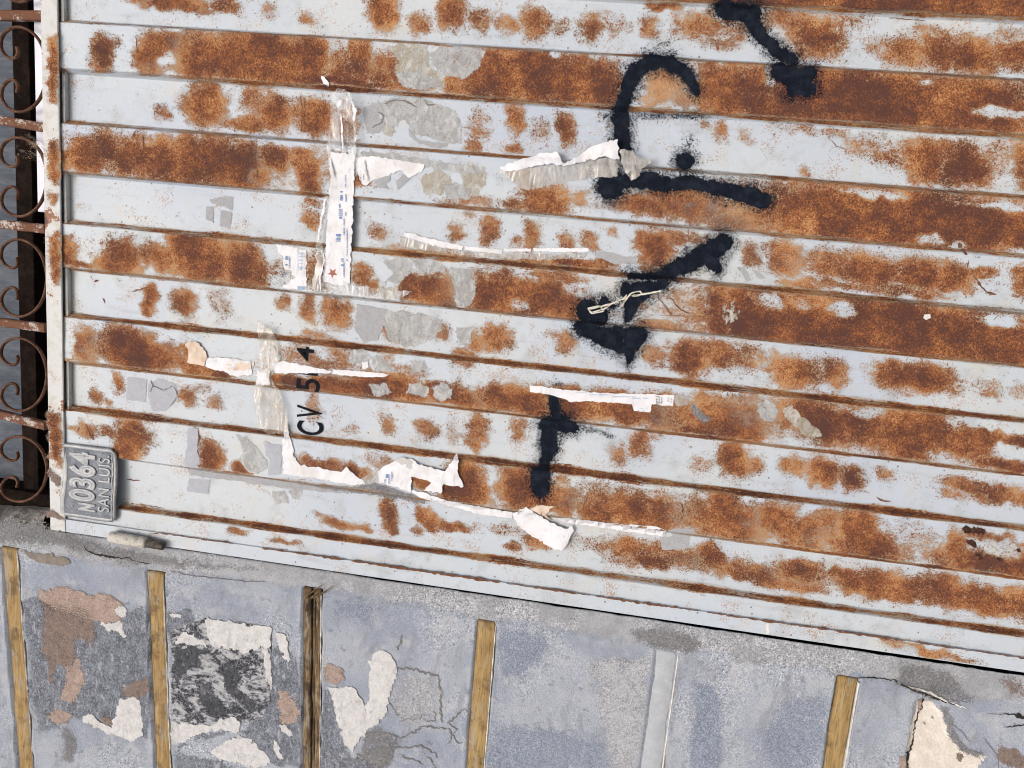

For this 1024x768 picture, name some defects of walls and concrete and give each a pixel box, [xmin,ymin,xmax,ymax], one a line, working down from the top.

corrosion [43,0,1024,637]
peeling [323,663,345,685]
peeling [334,667,468,768]
flaking render [899,698,986,768]
crack [862,677,1024,768]